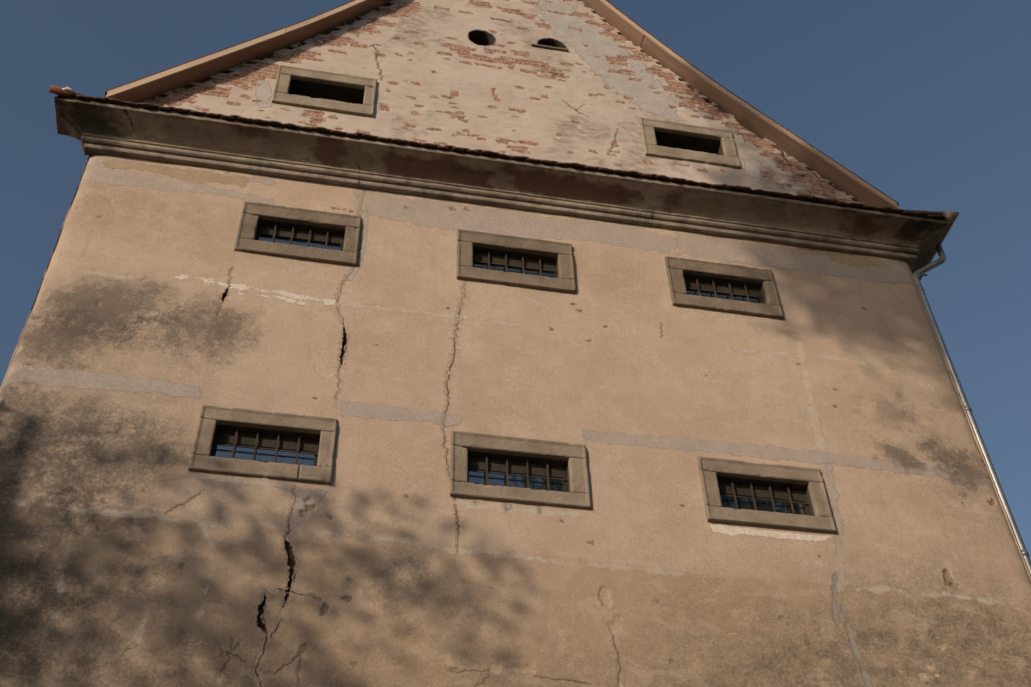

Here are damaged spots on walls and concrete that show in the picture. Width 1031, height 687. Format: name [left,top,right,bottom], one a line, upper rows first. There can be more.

flaking render [141,0,852,203]
crack [213,266,235,331]
crack [333,165,366,400]
crack [213,485,321,687]